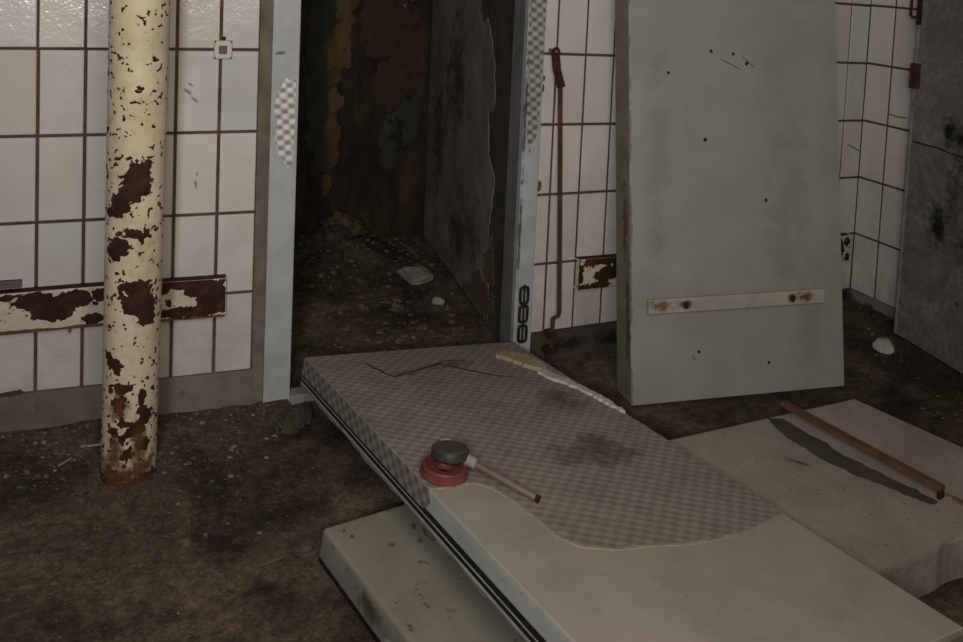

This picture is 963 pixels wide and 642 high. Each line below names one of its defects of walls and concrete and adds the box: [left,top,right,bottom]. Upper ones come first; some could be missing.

spalling [137,2,170,30]
rust [105,156,154,262]
spalling [107,28,167,193]
spalling [143,194,164,236]
peeling [321,0,360,196]
peeling [424,0,496,312]
rust [0,274,226,335]
spalling [101,293,138,471]
rust [100,351,157,487]